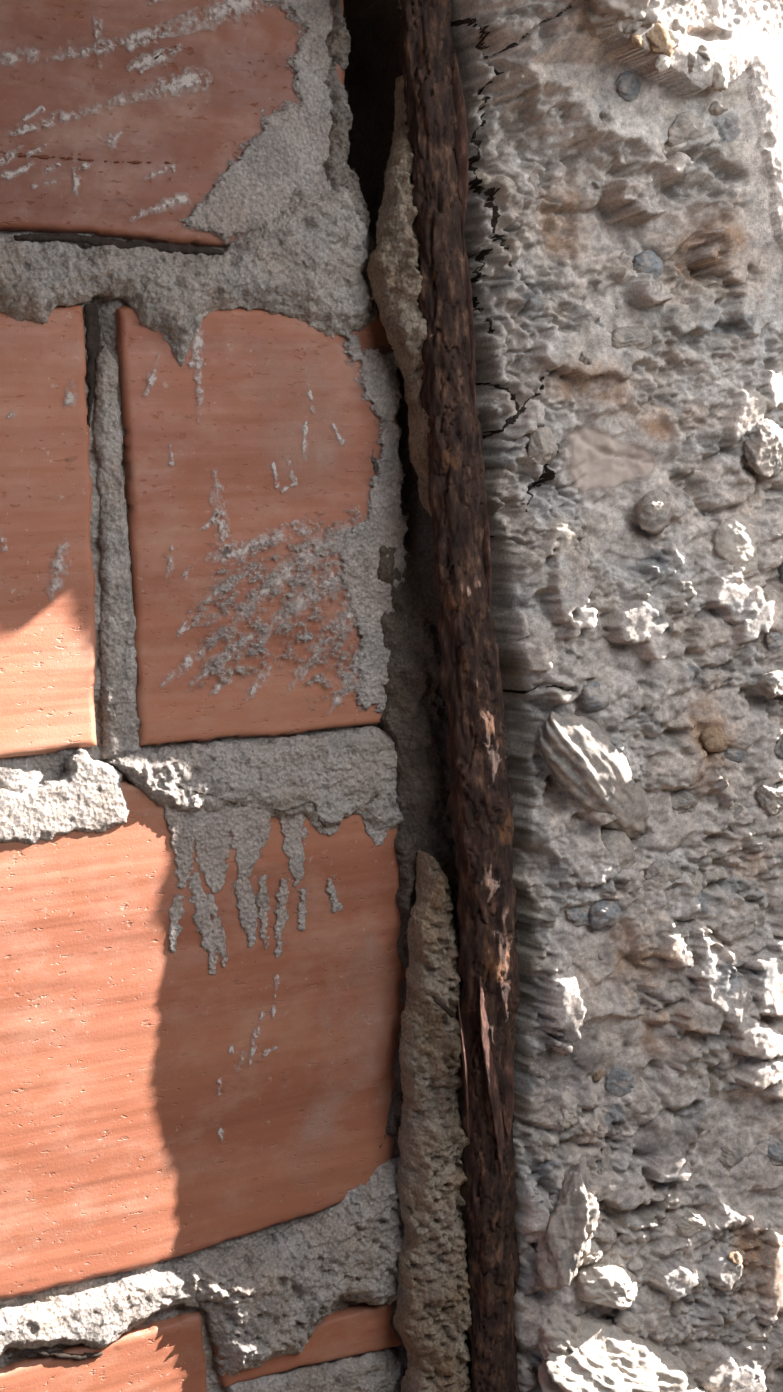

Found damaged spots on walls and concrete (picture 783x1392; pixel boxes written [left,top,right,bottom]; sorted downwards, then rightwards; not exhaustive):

crack [451,4,572,334]
crack [475,376,545,439]
crack [525,451,559,512]
spalling [450,0,783,1392]
rust [458,976,514,1177]